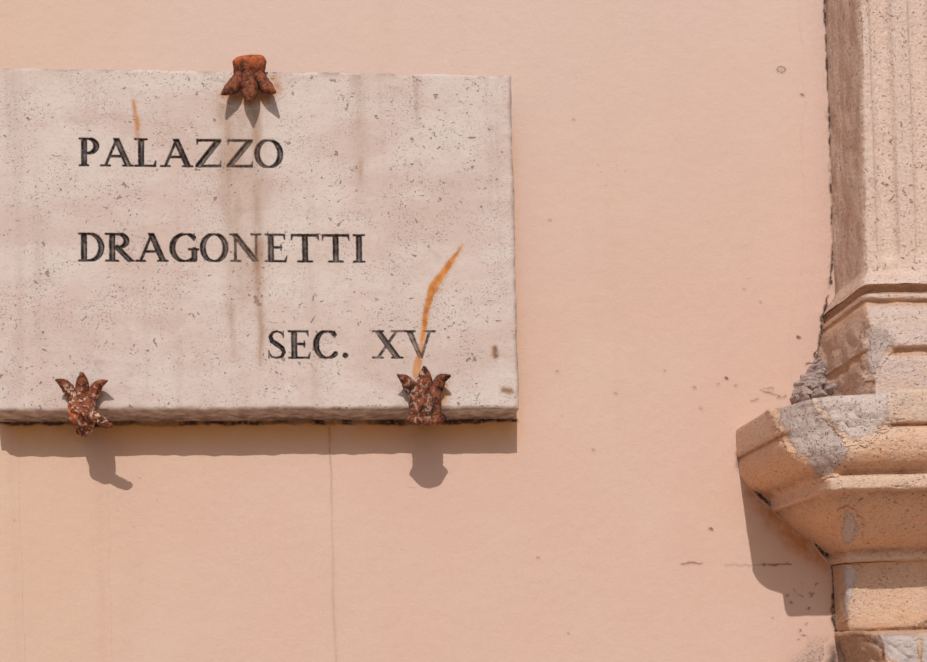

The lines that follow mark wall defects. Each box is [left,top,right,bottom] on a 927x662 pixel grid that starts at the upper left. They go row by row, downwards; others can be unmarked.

corrosion [129,98,142,143]
corrosion [212,75,285,110]
crack [804,0,835,367]
corrosion [411,242,465,380]
corrosion [438,373,453,407]
spalling [750,358,898,483]
crack [327,426,339,662]
crack [679,560,793,568]
crack [734,450,836,633]